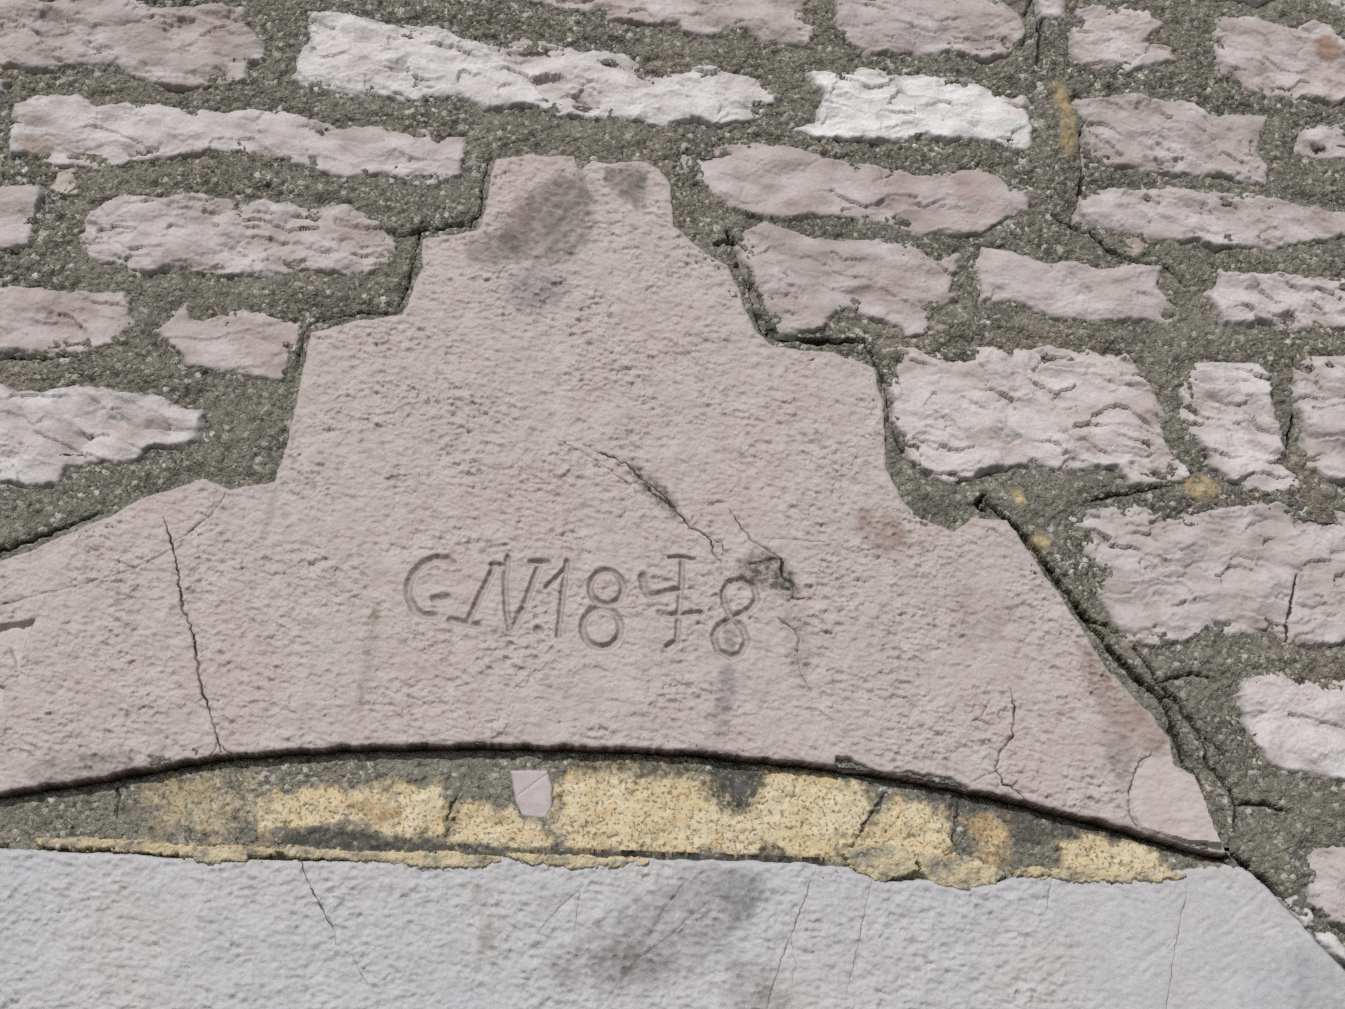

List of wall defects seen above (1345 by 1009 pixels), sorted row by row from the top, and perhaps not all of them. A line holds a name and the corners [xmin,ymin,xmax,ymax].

crack [163,514,238,762]
peeling [35,835,649,870]
crack [583,444,800,653]
peeling [840,843,1187,891]
crack [973,496,1289,896]
spalling [1132,756,1221,842]